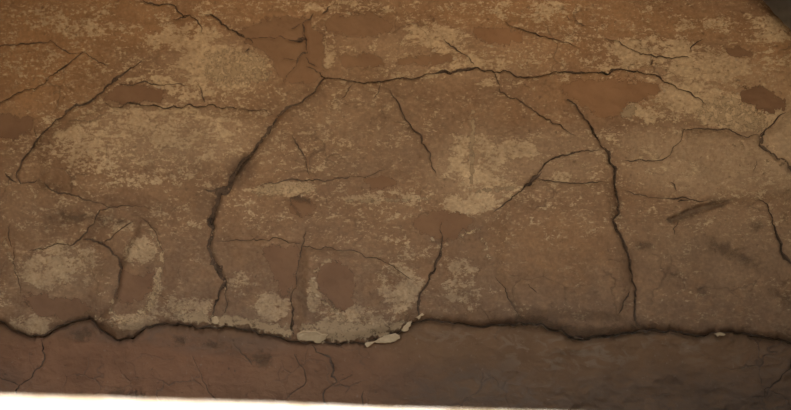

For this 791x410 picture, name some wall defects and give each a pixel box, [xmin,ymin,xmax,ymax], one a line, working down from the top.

crack [143,0,202,32]
crack [390,91,436,173]
crack [342,38,704,135]
crack [0,13,410,407]
crack [411,99,791,343]
peeling [365,313,425,347]